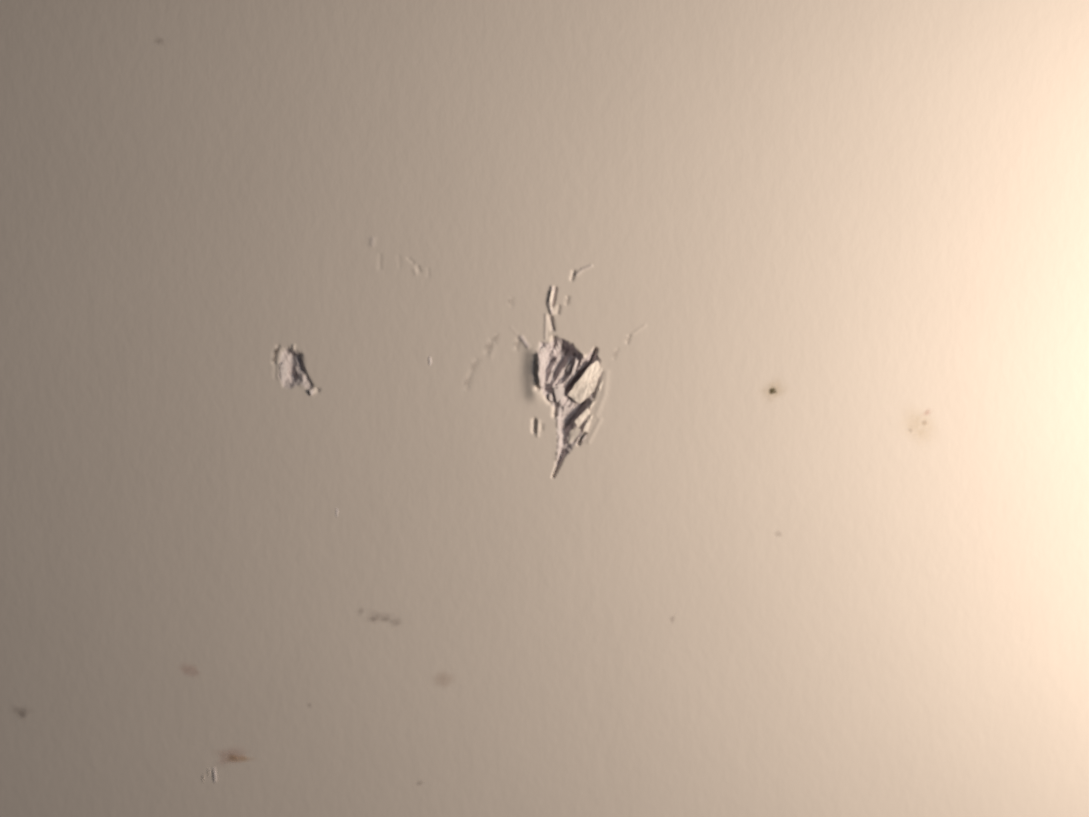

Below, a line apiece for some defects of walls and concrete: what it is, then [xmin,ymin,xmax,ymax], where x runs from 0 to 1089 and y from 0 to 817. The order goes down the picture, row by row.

spalling [270,342,322,398]
spalling [462,263,647,480]